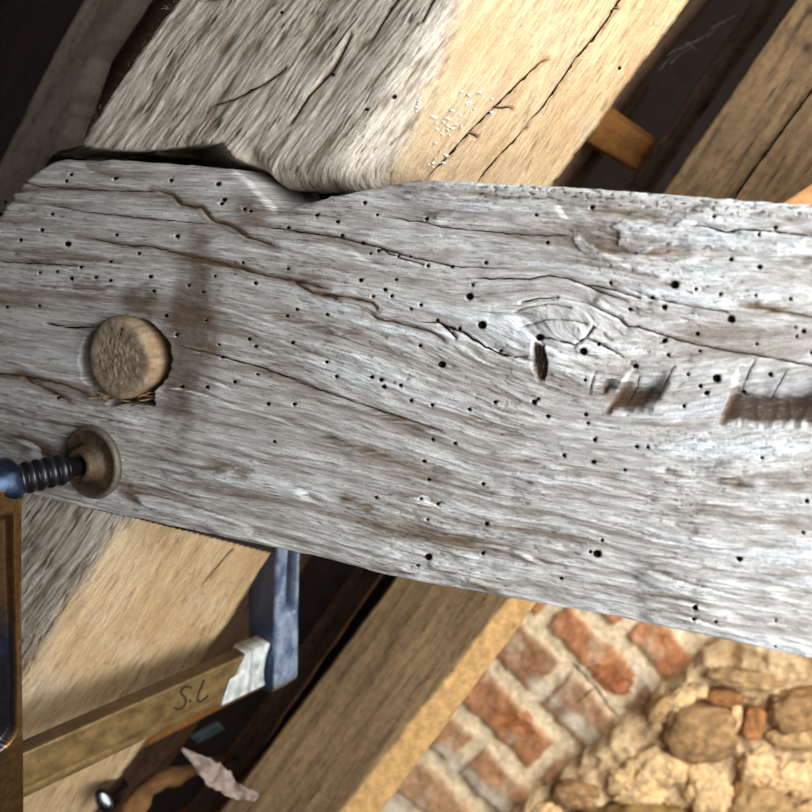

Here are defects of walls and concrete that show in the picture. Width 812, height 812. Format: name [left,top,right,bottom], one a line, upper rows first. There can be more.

crack [427,58,549,180]
crack [478,0,621,182]
crack [17,180,812,366]